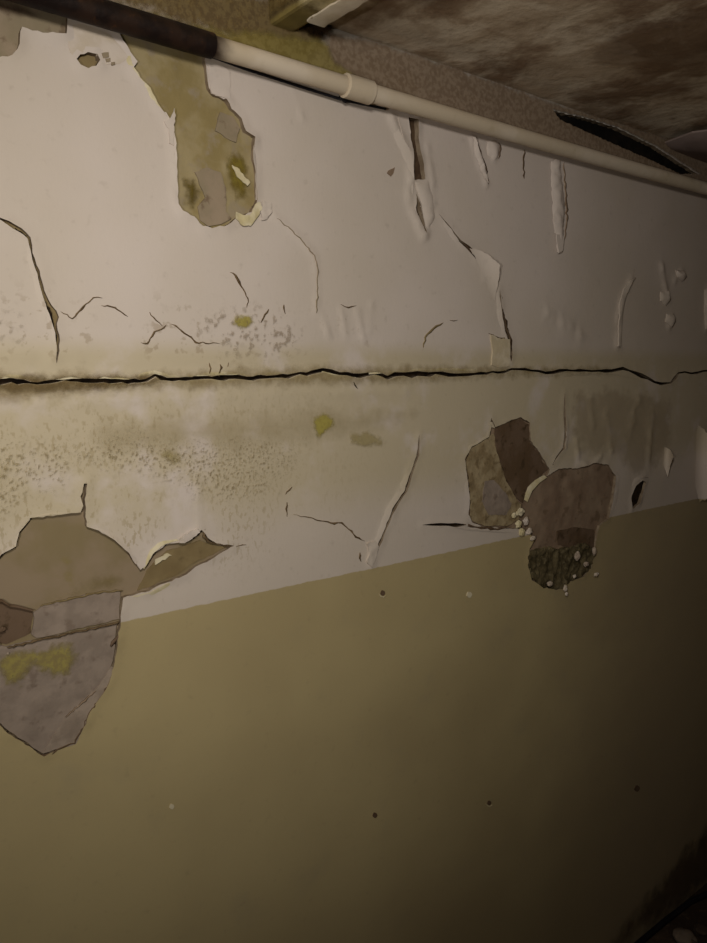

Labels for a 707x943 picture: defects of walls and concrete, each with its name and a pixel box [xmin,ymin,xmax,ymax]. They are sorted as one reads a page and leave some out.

flaking render [0,0,67,57]
leakage [110,0,354,75]
flaking render [102,34,272,228]
peeling [394,117,435,230]
peeling [551,159,568,253]
crack [0,218,707,389]
leakage [0,376,167,396]
crack [285,455,417,567]
flaking render [464,418,620,596]
peeling [631,475,648,507]
flaking render [695,425,707,502]
flaking render [0,484,244,756]